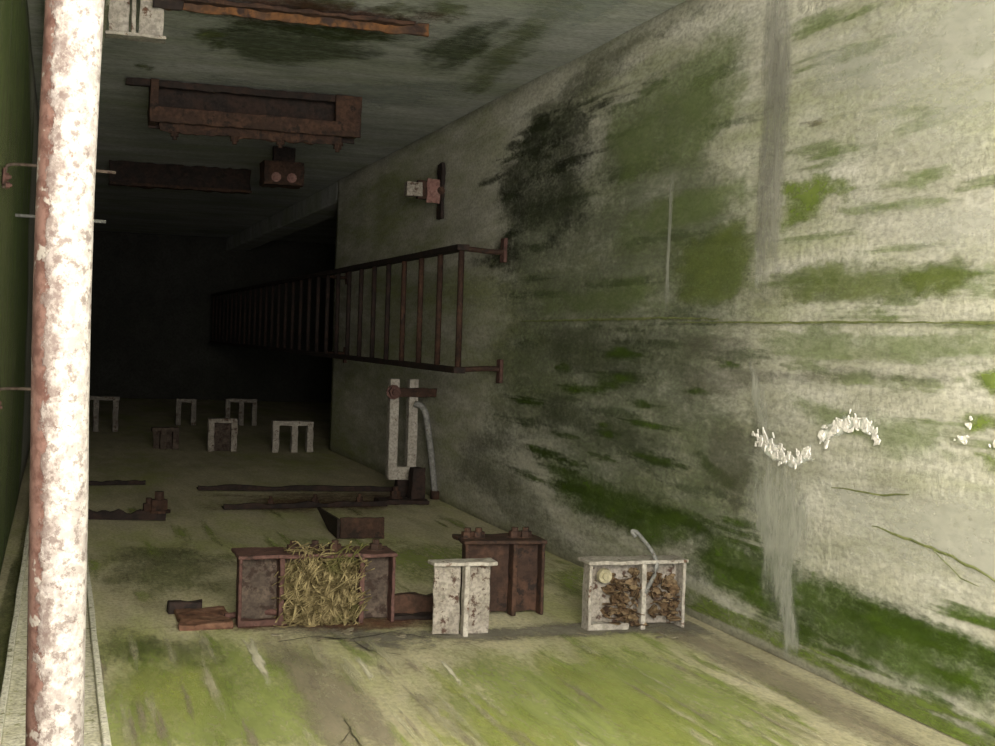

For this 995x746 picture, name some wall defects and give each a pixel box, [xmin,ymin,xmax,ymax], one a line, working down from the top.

leakage [248,23,398,41]
leakage [625,468,995,746]
leakage [248,635,416,746]